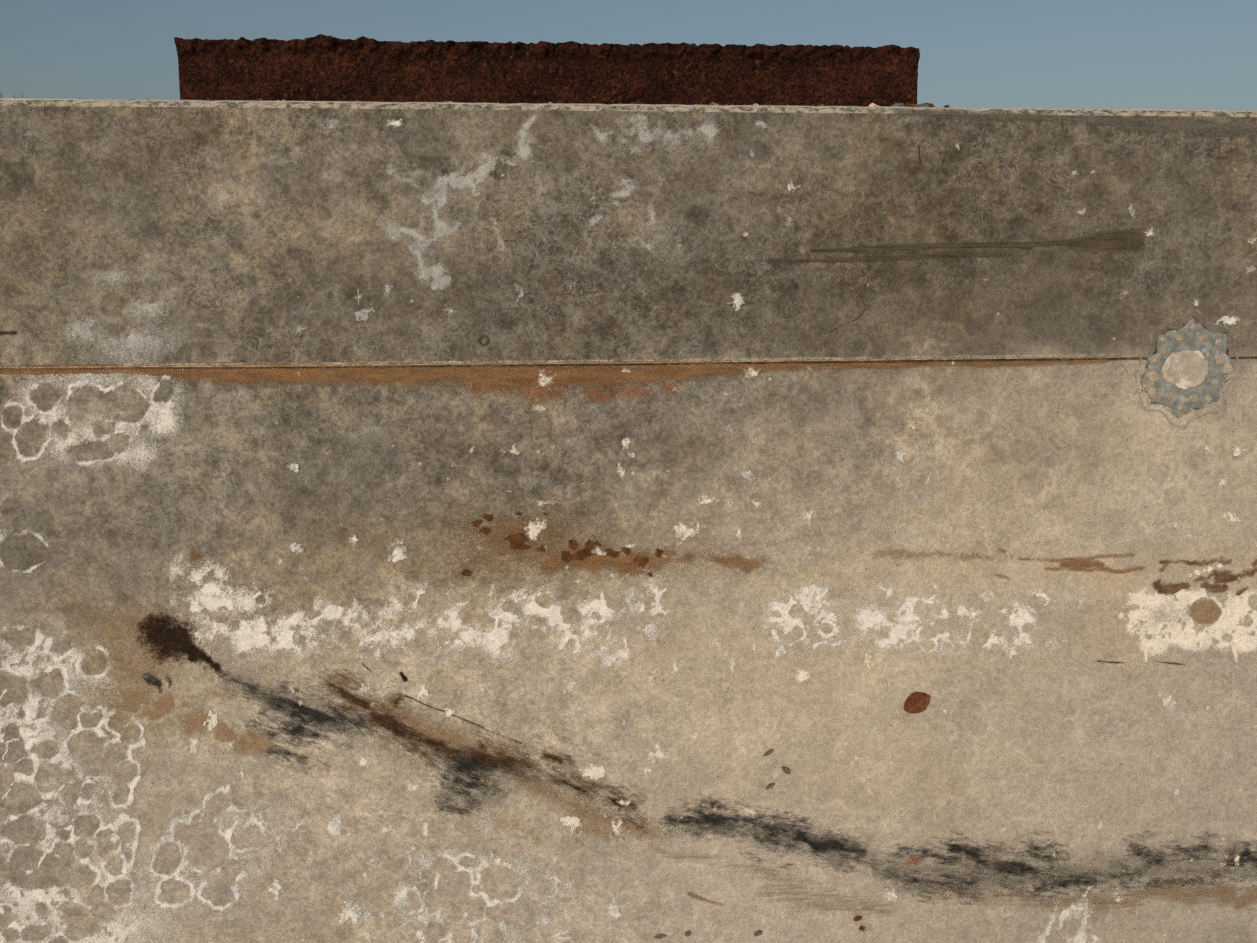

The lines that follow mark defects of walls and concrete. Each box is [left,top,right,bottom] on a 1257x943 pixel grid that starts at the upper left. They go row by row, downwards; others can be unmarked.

damp [382,116,535,290]
damp [1,297,183,469]
corrosion [0,359,1111,398]
damp [170,553,674,666]
corrosion [489,522,692,574]
corrosion [714,556,758,572]
damp [763,583,1087,664]
corrosion [1048,554,1144,573]
corrosion [1153,560,1257,595]
damp [0,626,303,943]
damp [364,822,578,943]
damp [1037,886,1099,943]